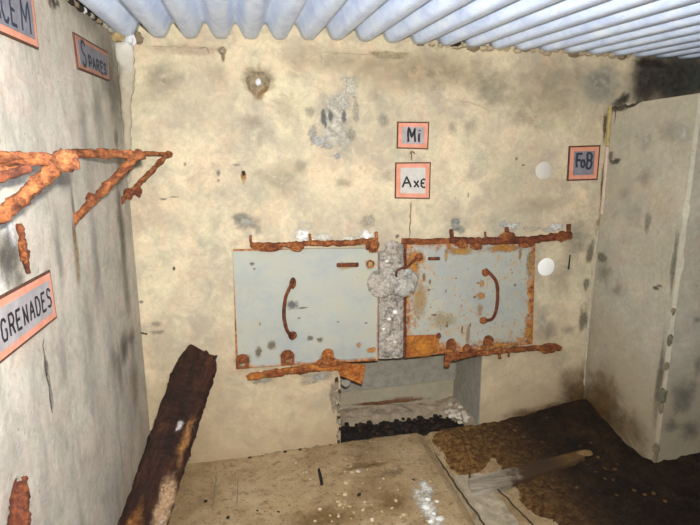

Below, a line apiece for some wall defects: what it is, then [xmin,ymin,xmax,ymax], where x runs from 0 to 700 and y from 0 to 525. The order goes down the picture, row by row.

spalling [245,70,272,98]
leakage [614,56,700,105]
peeling [309,76,358,158]
corrosion [123,187,142,200]
corrosion [18,239,28,263]
corrosion [489,244,533,275]
corrosion [7,474,32,525]